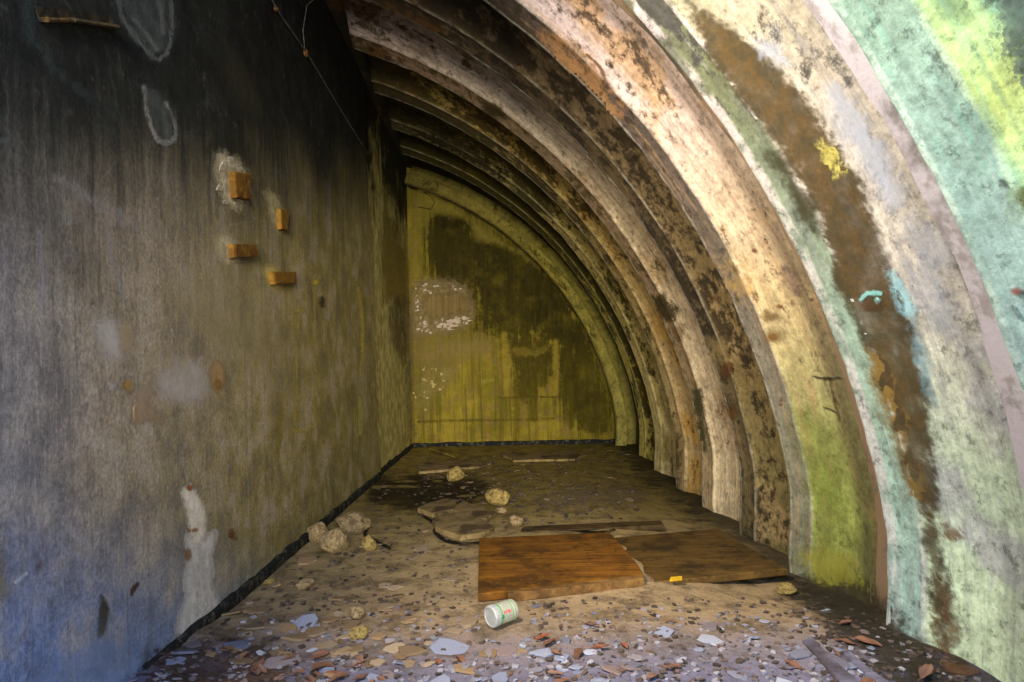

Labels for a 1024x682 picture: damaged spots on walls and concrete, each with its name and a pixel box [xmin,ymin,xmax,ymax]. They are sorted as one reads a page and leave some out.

leakage [502,330,613,433]
rust [685,0,979,676]
leakage [176,484,218,634]